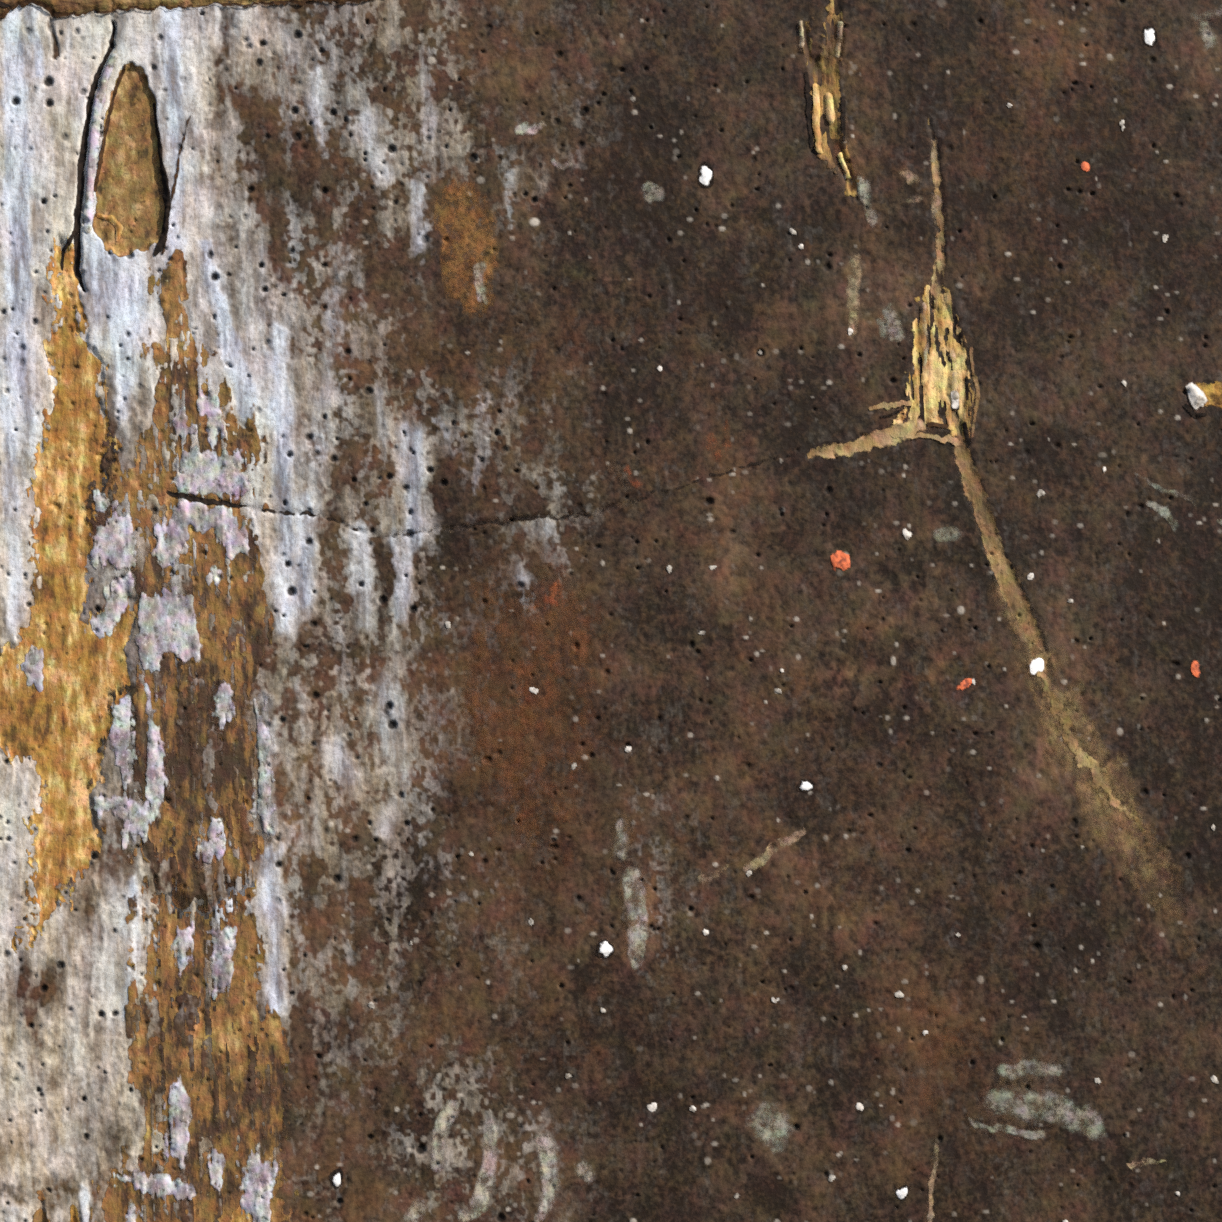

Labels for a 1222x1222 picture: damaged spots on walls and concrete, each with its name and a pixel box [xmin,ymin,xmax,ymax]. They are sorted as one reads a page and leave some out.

crack [60,22,116,292]
crack [170,116,191,202]
corrosion [435,180,495,312]
spalling [799,0,876,224]
crack [167,490,358,531]
crack [393,119,1168,878]
spalling [1183,381,1222,418]
peeling [0,53,299,1222]